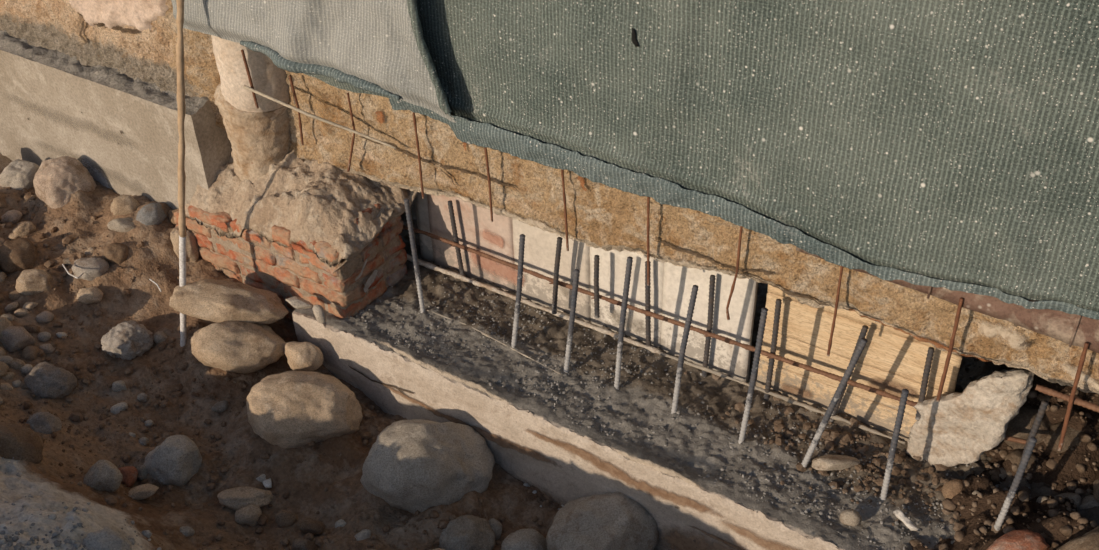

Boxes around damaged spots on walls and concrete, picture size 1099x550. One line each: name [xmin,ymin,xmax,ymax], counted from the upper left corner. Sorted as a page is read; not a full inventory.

spalling [979,322,1025,350]
crack [349,366,414,394]
spalling [1062,365,1099,390]
spalling [994,384,1099,531]